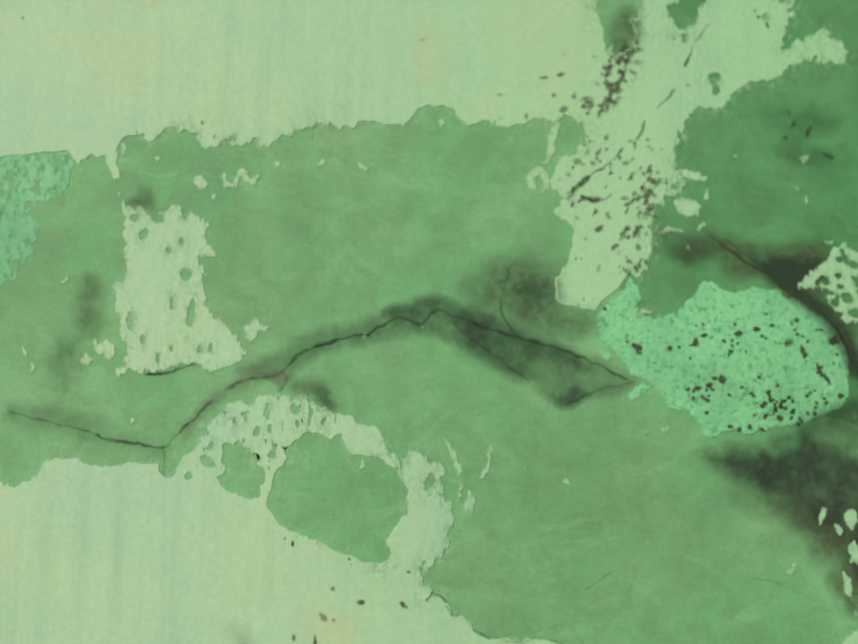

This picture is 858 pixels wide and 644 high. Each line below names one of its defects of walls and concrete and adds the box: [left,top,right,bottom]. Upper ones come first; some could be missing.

peeling [620,0,858,360]
spalling [596,277,850,438]
peeling [263,403,272,433]
peeling [825,368,858,425]
peeling [200,426,265,499]
peeling [267,432,409,564]
peeling [424,473,436,491]
water stain [724,439,858,607]
peeling [844,492,858,531]